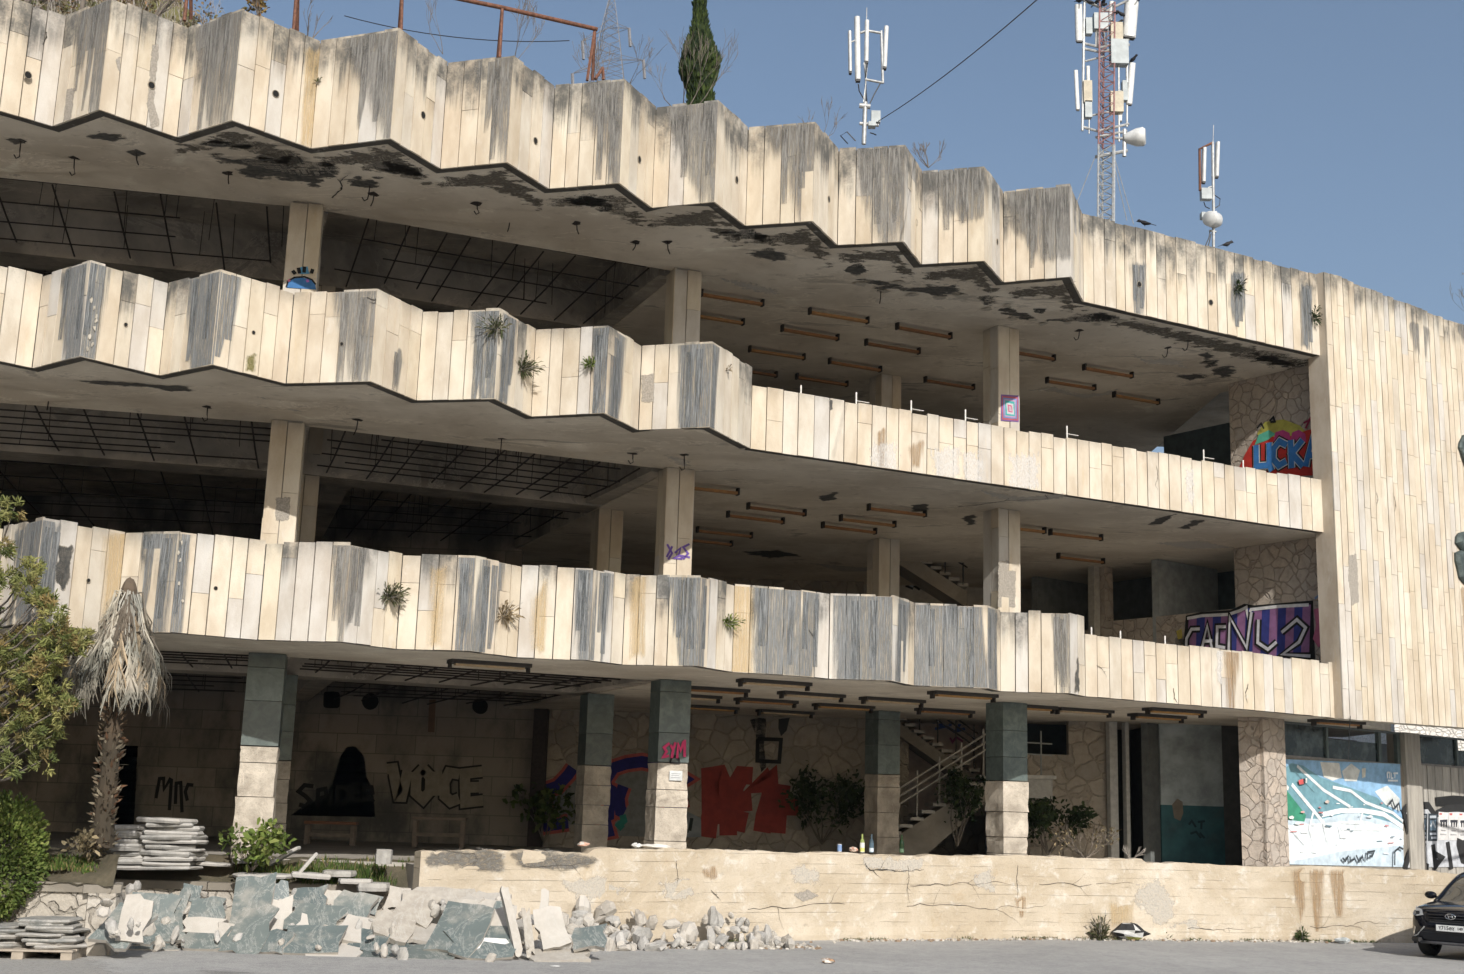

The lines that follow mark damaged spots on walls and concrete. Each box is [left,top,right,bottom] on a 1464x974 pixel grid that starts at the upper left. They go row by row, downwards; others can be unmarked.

leakage [72,0,110,112]
leakage [347,30,399,138]
leakage [58,262,110,359]
leakage [186,271,241,368]
leakage [471,311,517,404]
leakage [592,327,626,419]
leakage [1230,273,1245,327]
leakage [669,577,710,667]
leakage [732,586,997,690]
leakage [1054,614,1071,693]
crack [675,861,843,922]
crack [865,863,1129,926]